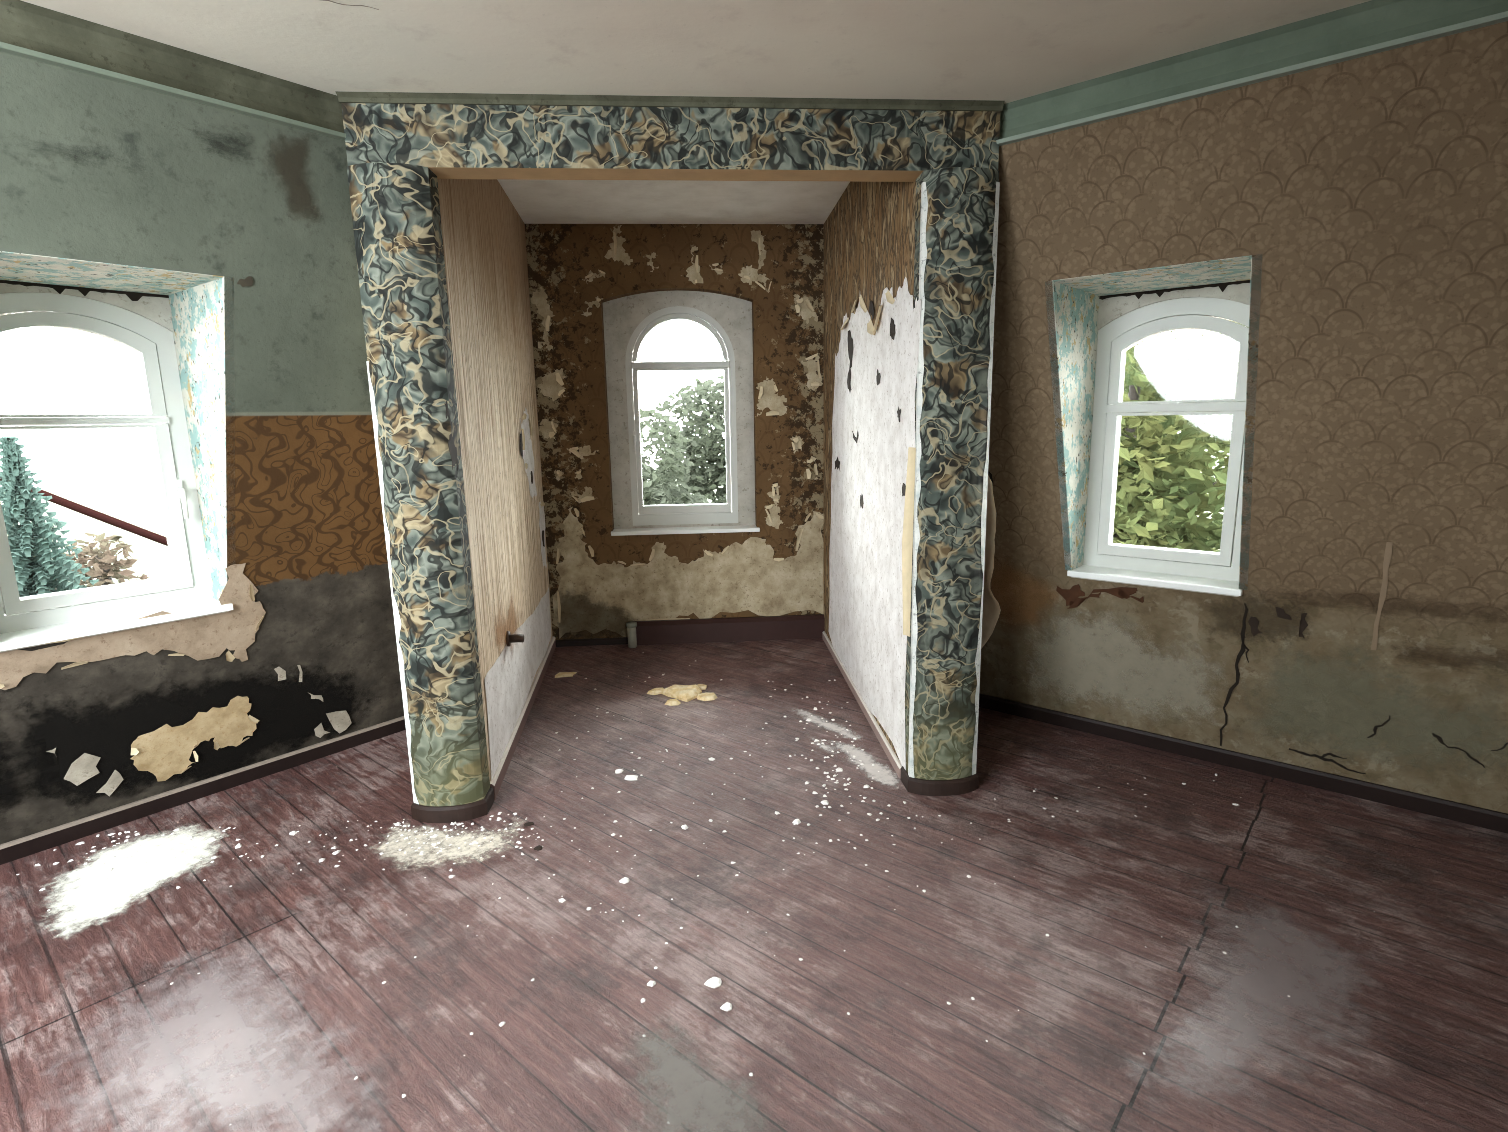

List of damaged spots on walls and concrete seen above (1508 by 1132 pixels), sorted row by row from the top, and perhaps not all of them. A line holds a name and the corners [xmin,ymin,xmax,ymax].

flaking render [0,563,266,690]
flaking render [46,696,260,796]
flaking render [314,710,352,738]